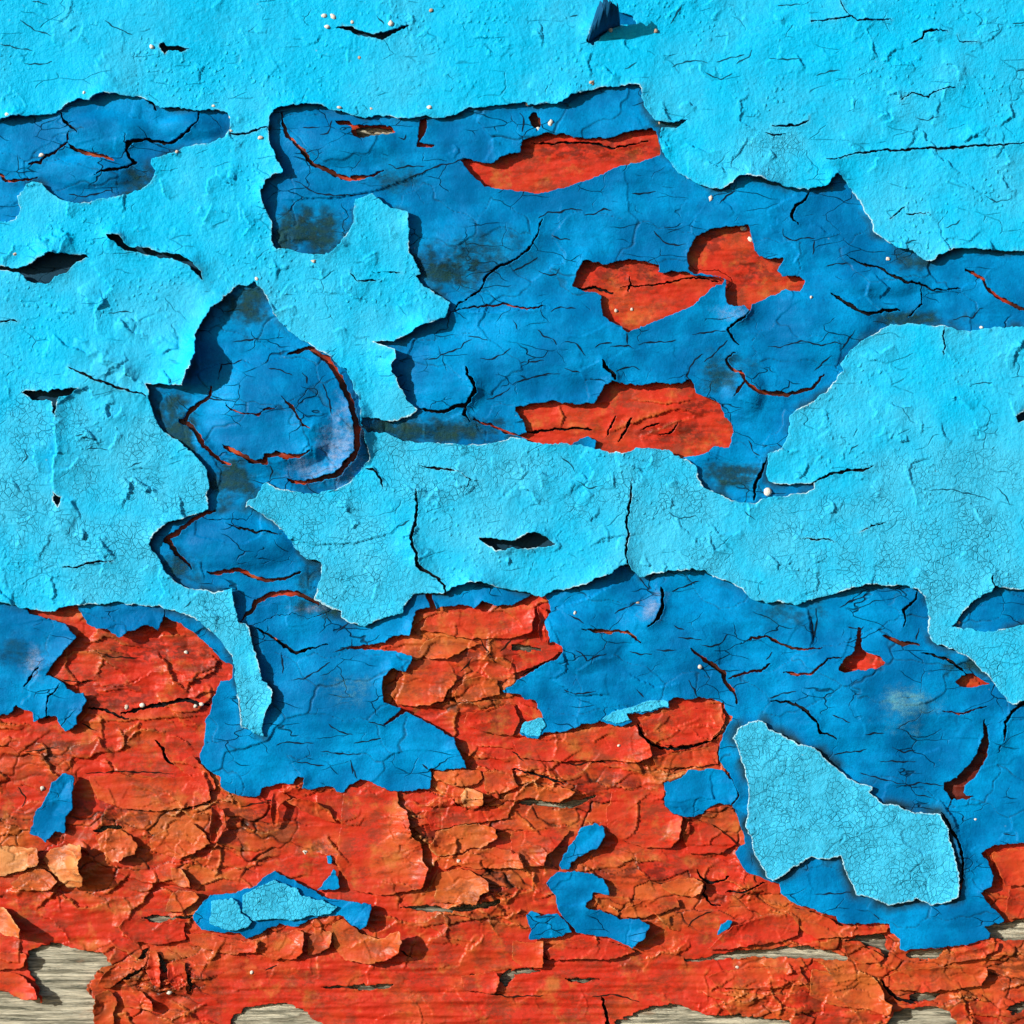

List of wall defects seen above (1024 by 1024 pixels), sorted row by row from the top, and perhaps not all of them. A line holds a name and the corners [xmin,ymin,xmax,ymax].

peeling [0,92,230,222]
crack [830,142,1024,160]
peeling [146,84,1024,632]
crack [396,465,477,595]
crack [570,484,966,893]
peeling [839,627,885,673]
peeling [956,668,989,687]
peeling [0,605,738,1024]
peeling [944,719,989,800]
peeling [684,848,1024,1024]
peeling [615,1003,791,1024]